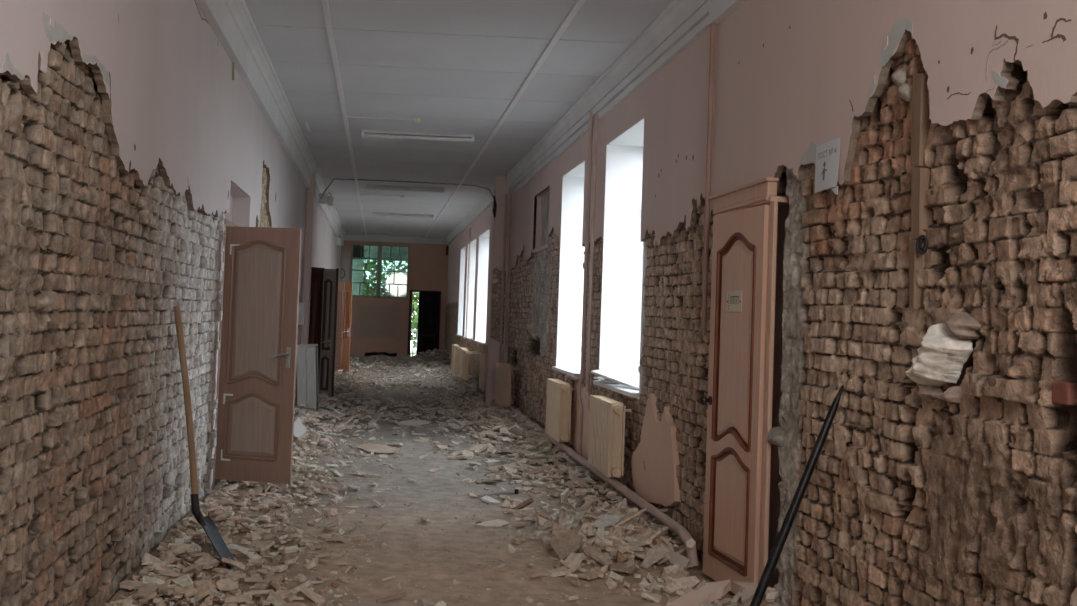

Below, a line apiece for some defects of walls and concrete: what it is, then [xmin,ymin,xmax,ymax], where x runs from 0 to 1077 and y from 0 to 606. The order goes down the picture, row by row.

flaking render [0,11,226,606]
flaking render [444,198,715,563]
flaking render [774,17,1077,606]
crack [947,18,1071,100]